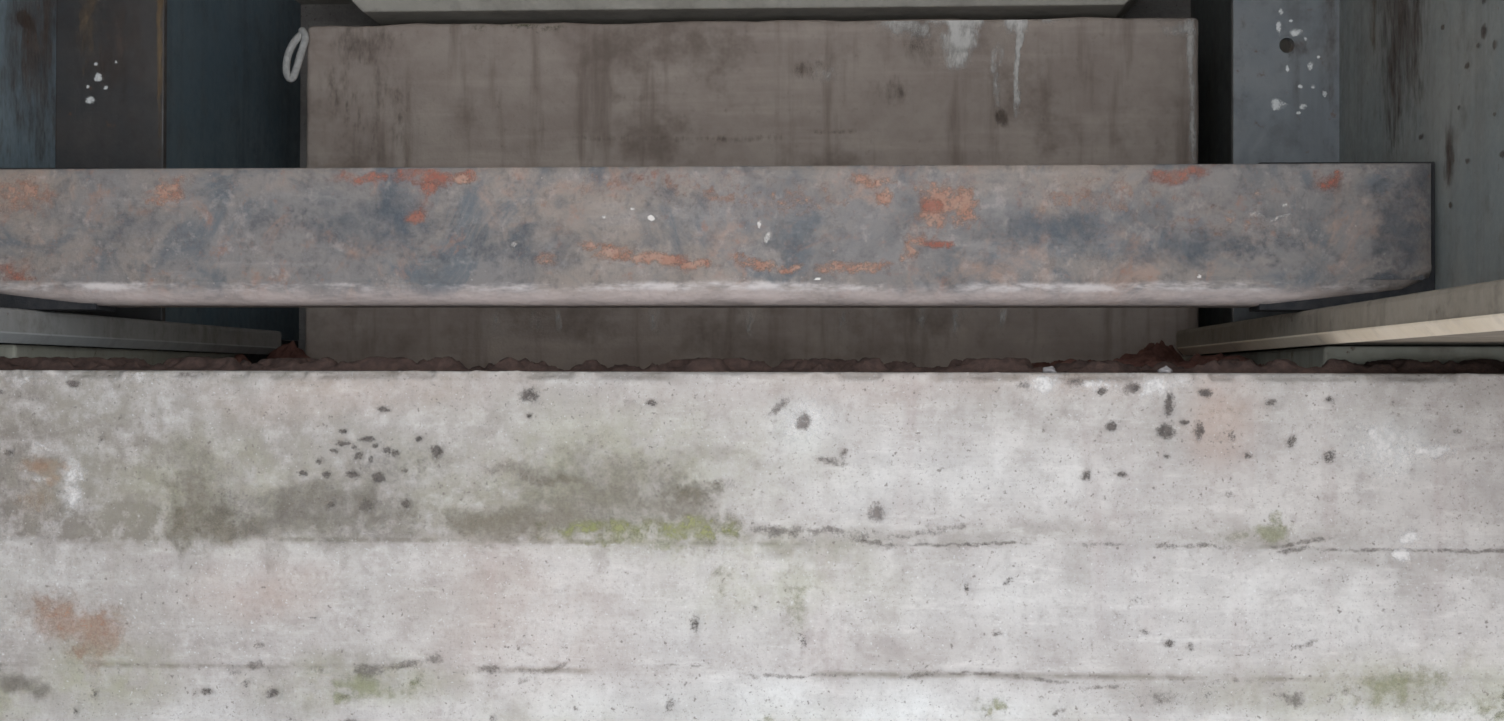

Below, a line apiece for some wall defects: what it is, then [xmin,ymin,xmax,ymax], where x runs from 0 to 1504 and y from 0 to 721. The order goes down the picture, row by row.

leakage [885,20,983,67]
leakage [996,19,1051,123]
corrosion [341,169,475,195]
corrosion [818,182,977,274]
corrosion [582,241,710,270]